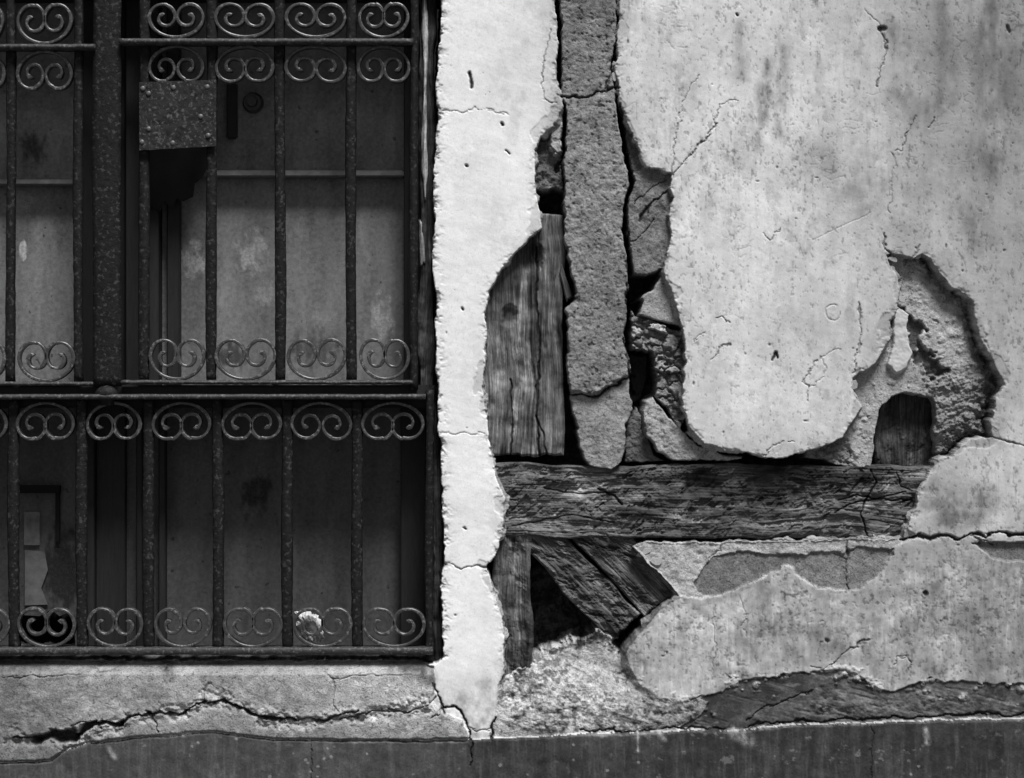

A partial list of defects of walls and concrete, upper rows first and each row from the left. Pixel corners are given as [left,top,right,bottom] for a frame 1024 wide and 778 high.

crack [541,29,739,399]
flaking render [488,0,1024,737]
crack [865,10,889,88]
crack [13,672,497,778]